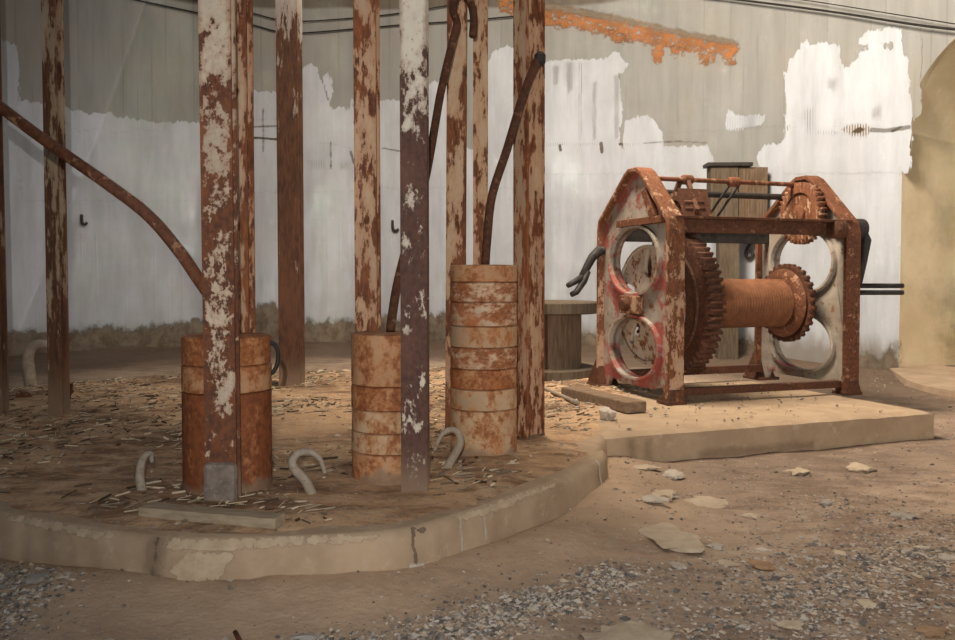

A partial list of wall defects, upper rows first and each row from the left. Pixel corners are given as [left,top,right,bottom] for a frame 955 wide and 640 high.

peeling [1,39,21,125]
peeling [254,89,277,194]
peeling [303,63,354,193]
peeling [380,98,400,190]
peeling [429,80,447,189]
peeling [488,44,513,189]
corrosion [545,3,739,66]
peeling [545,15,923,176]
crack [409,527,426,568]